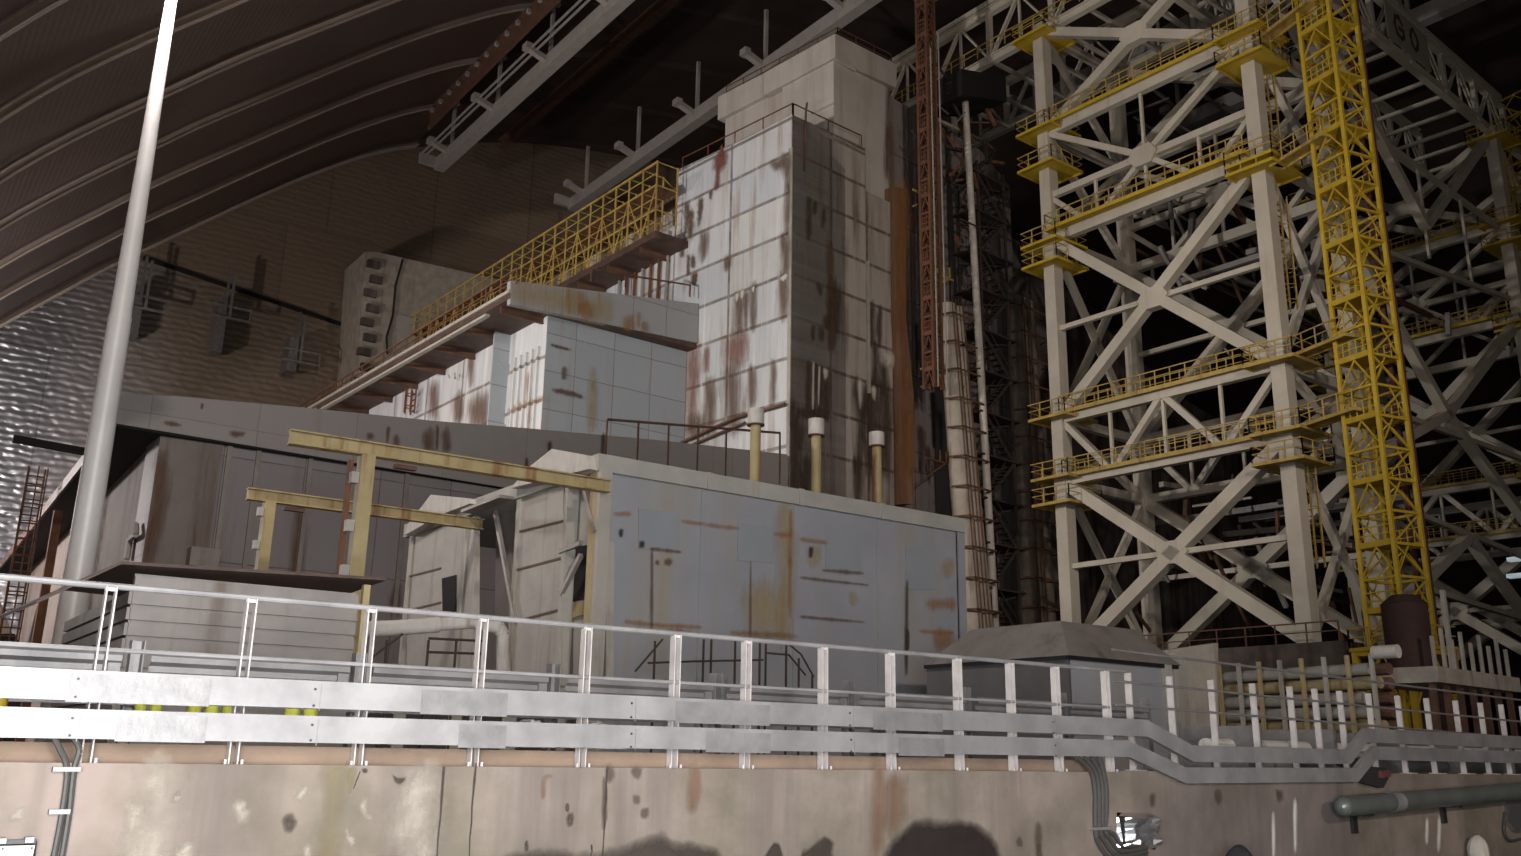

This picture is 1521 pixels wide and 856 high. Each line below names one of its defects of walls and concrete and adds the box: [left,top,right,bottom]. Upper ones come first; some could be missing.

rust [885,87,894,187]
rust [692,233,706,284]
rust [772,155,789,315]
rust [425,359,487,450]
rust [688,284,775,436]
rust [635,548,697,632]
rust [739,581,791,637]
rust [778,534,861,602]